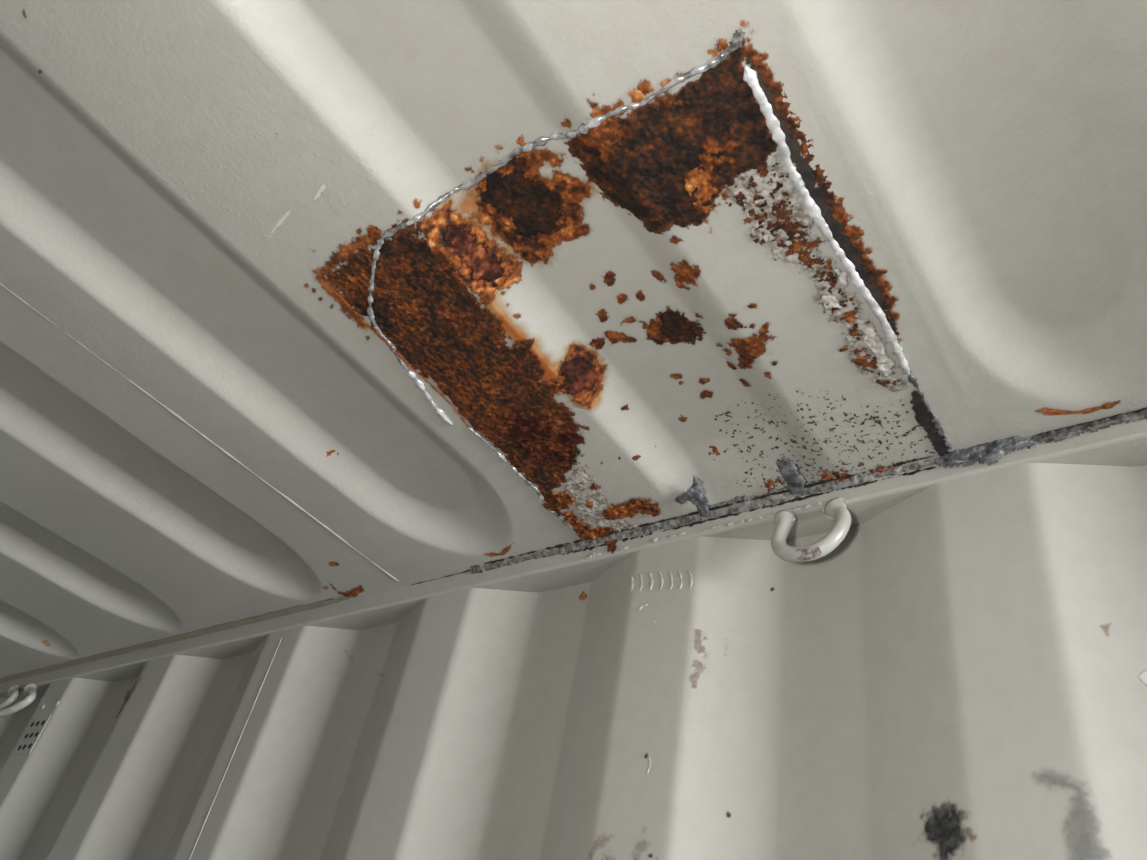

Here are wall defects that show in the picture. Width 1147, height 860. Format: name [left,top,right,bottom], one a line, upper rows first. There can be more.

corrosion [304,21,777,520]
peeling [717,153,906,392]
corrosion [708,390,935,491]
corrosion [1035,401,1147,436]
corrosion [605,539,617,554]